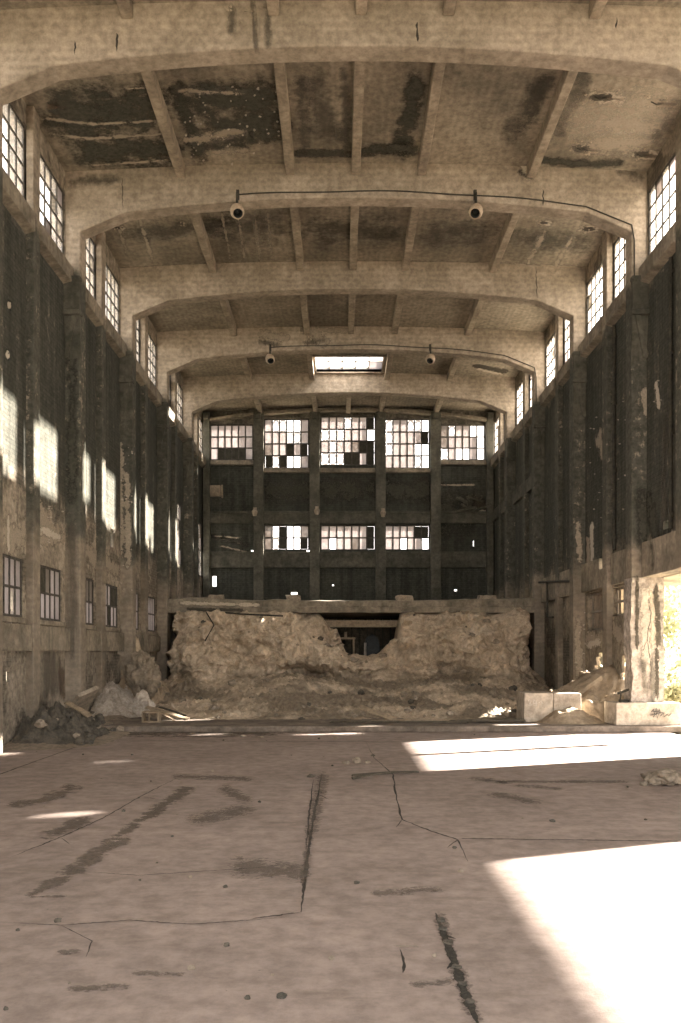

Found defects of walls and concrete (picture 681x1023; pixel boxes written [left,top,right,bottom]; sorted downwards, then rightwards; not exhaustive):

damp [45,117,161,140]
damp [505,76,554,140]
damp [541,72,680,168]
spalling [574,577,661,698]
crack [370,751,493,861]
crack [7,779,328,956]
crack [435,913,479,1023]